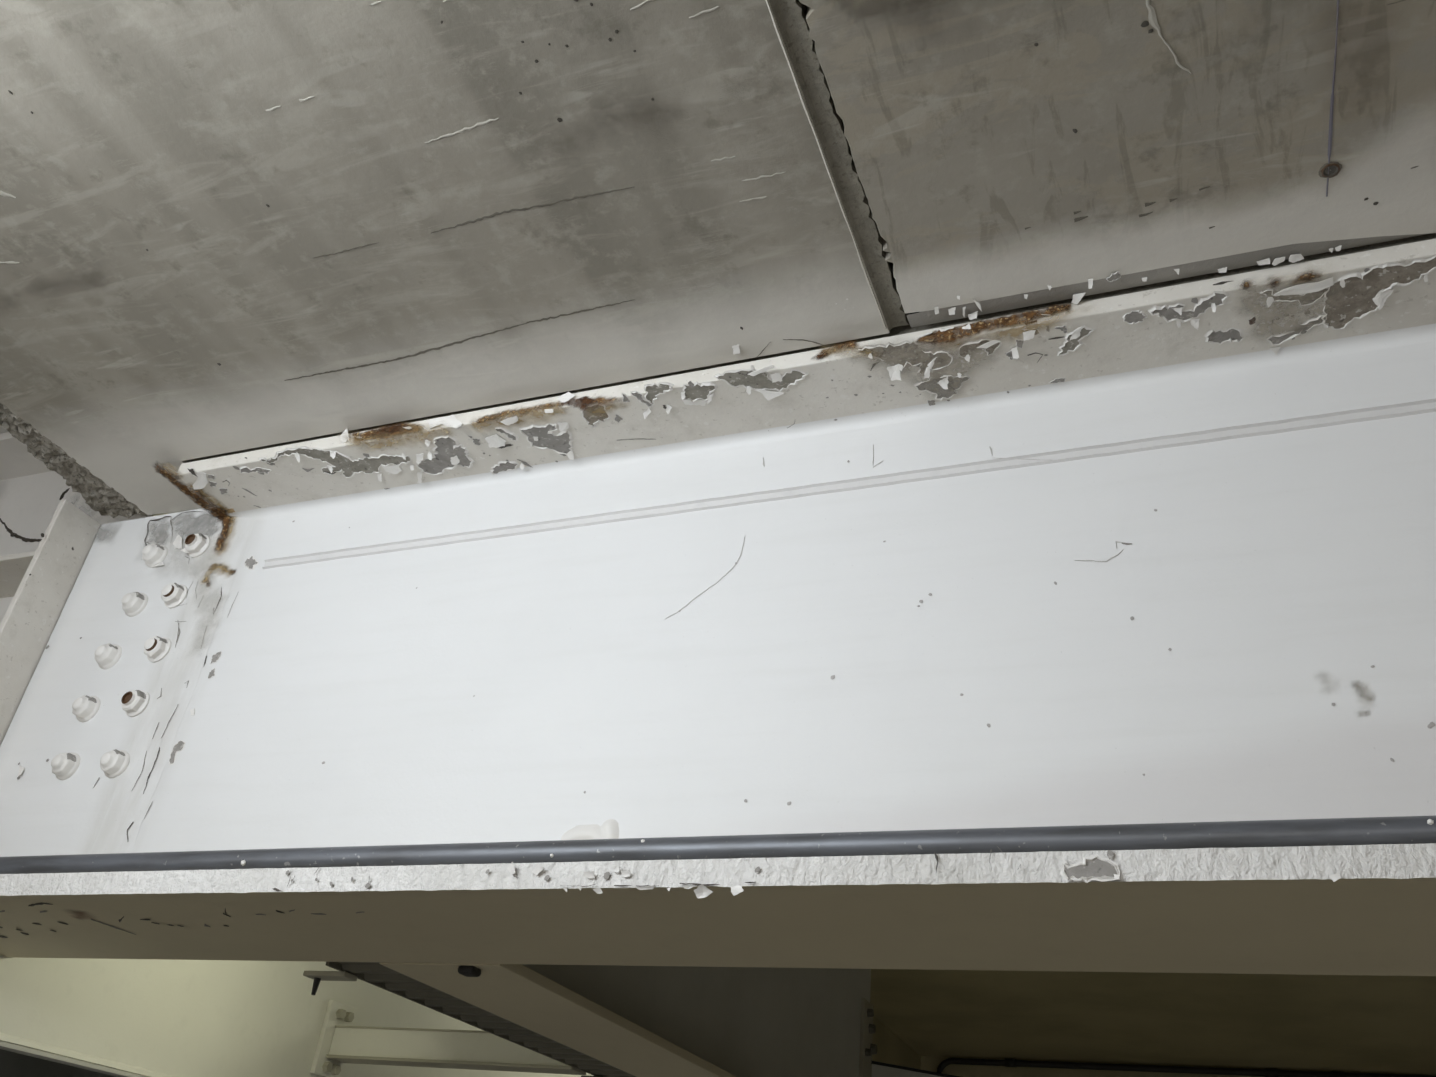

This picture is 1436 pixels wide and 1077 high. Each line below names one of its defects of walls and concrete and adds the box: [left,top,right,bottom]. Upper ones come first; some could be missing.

peeling [934,295,982,320]
rust [916,304,1071,345]
peeling [1071,271,1121,304]
peeling [1122,254,1436,355]
peeling [614,327,808,423]
peeling [857,325,1095,406]
rust [339,392,617,448]
rust [154,463,235,586]